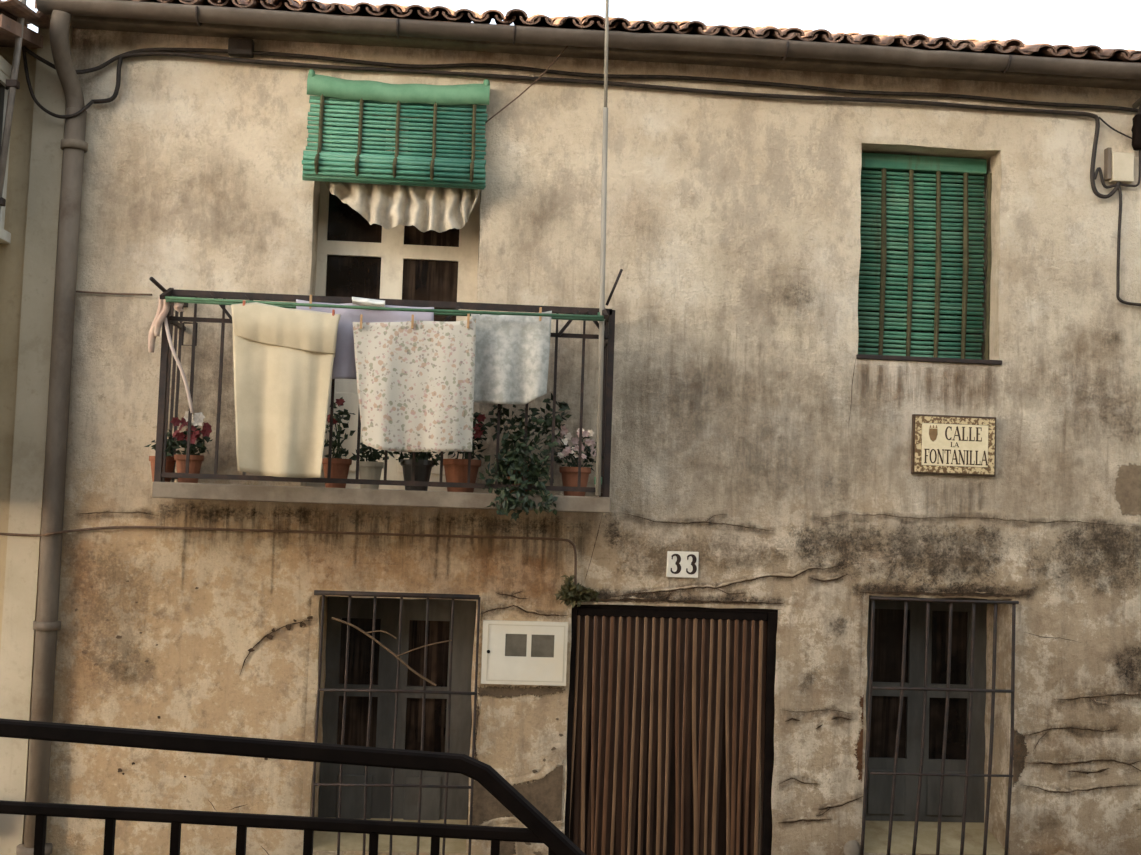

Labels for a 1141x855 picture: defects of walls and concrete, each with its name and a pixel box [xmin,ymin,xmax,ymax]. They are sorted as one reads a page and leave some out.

spalling [1114,463,1141,516]
crack [480,511,1030,616]
leakage [798,525,1036,596]
leakage [1034,526,1141,591]
crack [240,616,313,674]
spalling [468,778,522,826]
spalling [474,685,565,760]
spalling [508,734,567,827]
crack [781,707,858,729]
crack [777,775,863,824]
crack [1020,691,1141,810]
spalling [487,840,542,855]